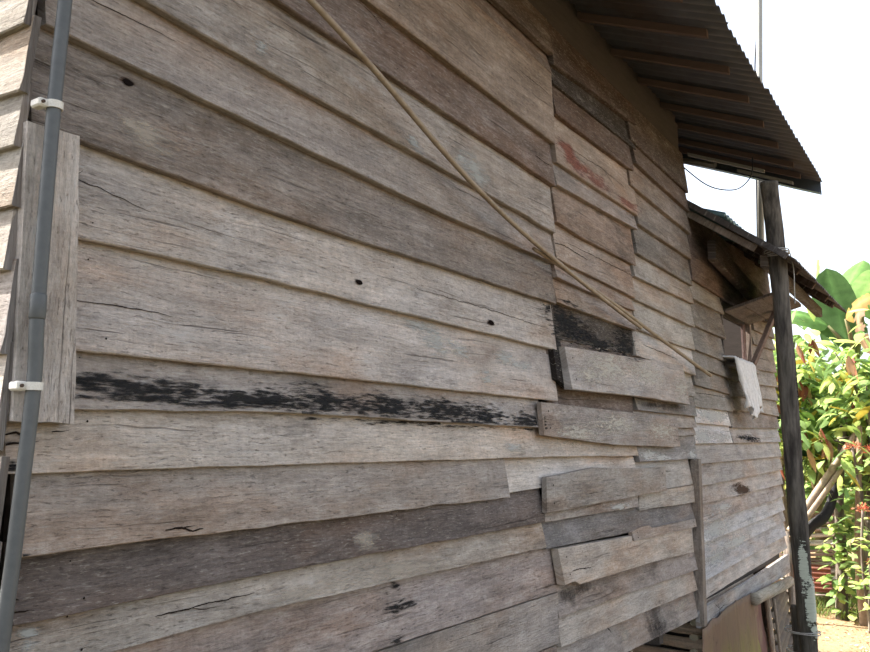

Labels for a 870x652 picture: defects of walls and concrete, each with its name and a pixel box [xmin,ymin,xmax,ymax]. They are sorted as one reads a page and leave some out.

leakage [543,298,639,362]
leakage [76,372,548,431]
crack [165,524,203,532]
crack [155,593,252,617]